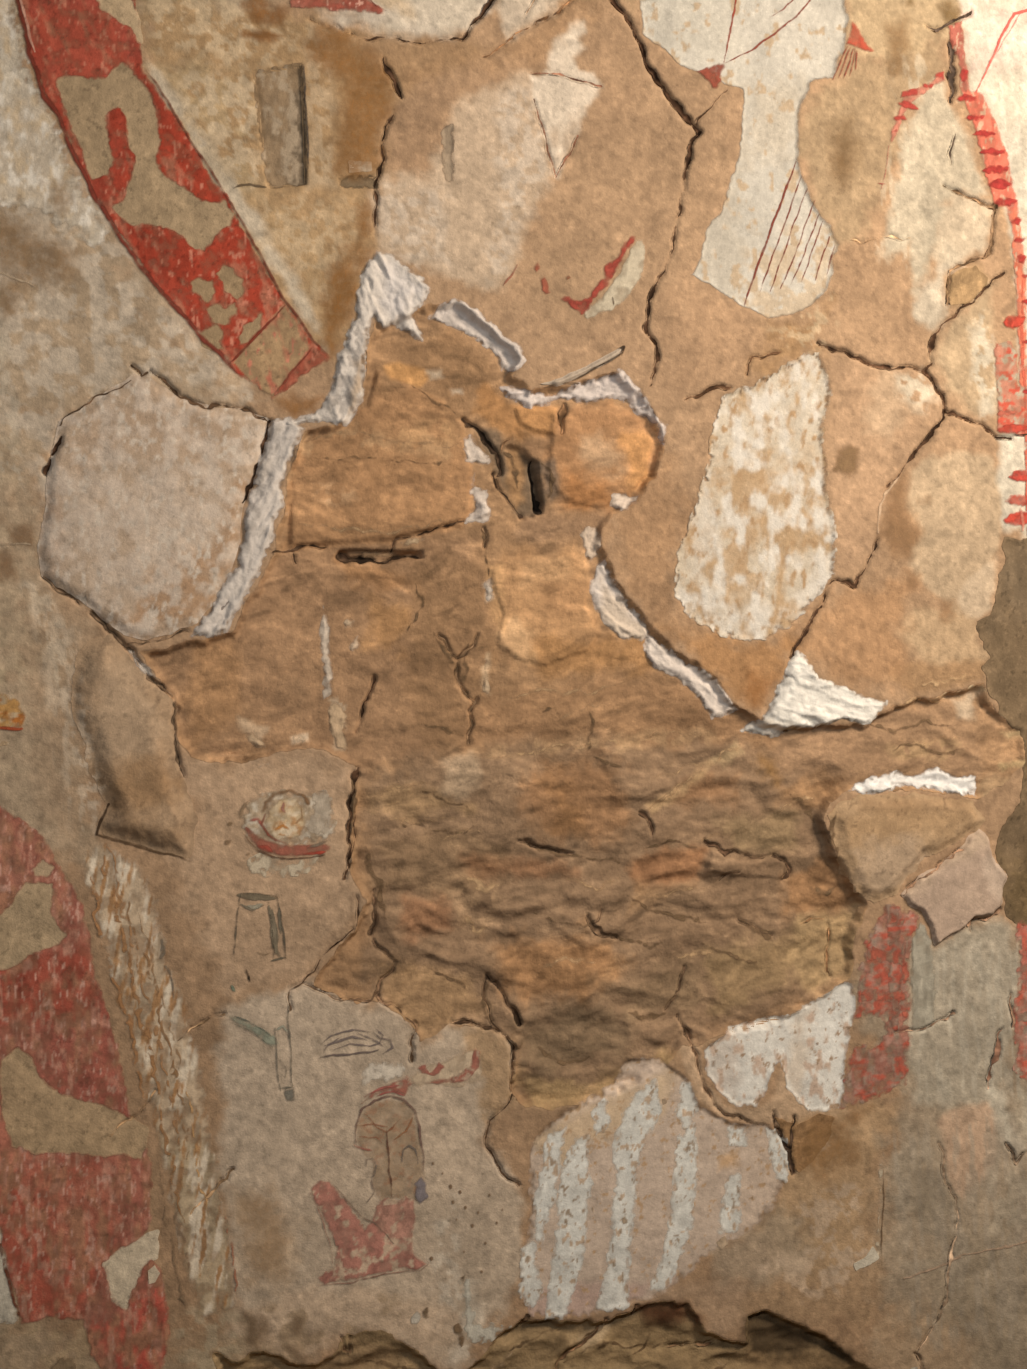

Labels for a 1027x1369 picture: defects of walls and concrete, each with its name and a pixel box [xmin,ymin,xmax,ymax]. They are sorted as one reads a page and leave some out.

crack [353,0,572,227]
crack [530,72,602,178]
crack [610,0,727,386]
crack [43,364,271,503]
crack [462,418,542,518]
crack [686,352,781,400]
crack [790,11,1027,659]
crack [272,521,487,564]
crack [43,576,188,777]
spalling [129,252,1025,1111]
spalling [212,1330,436,1369]
spalling [469,1300,871,1369]